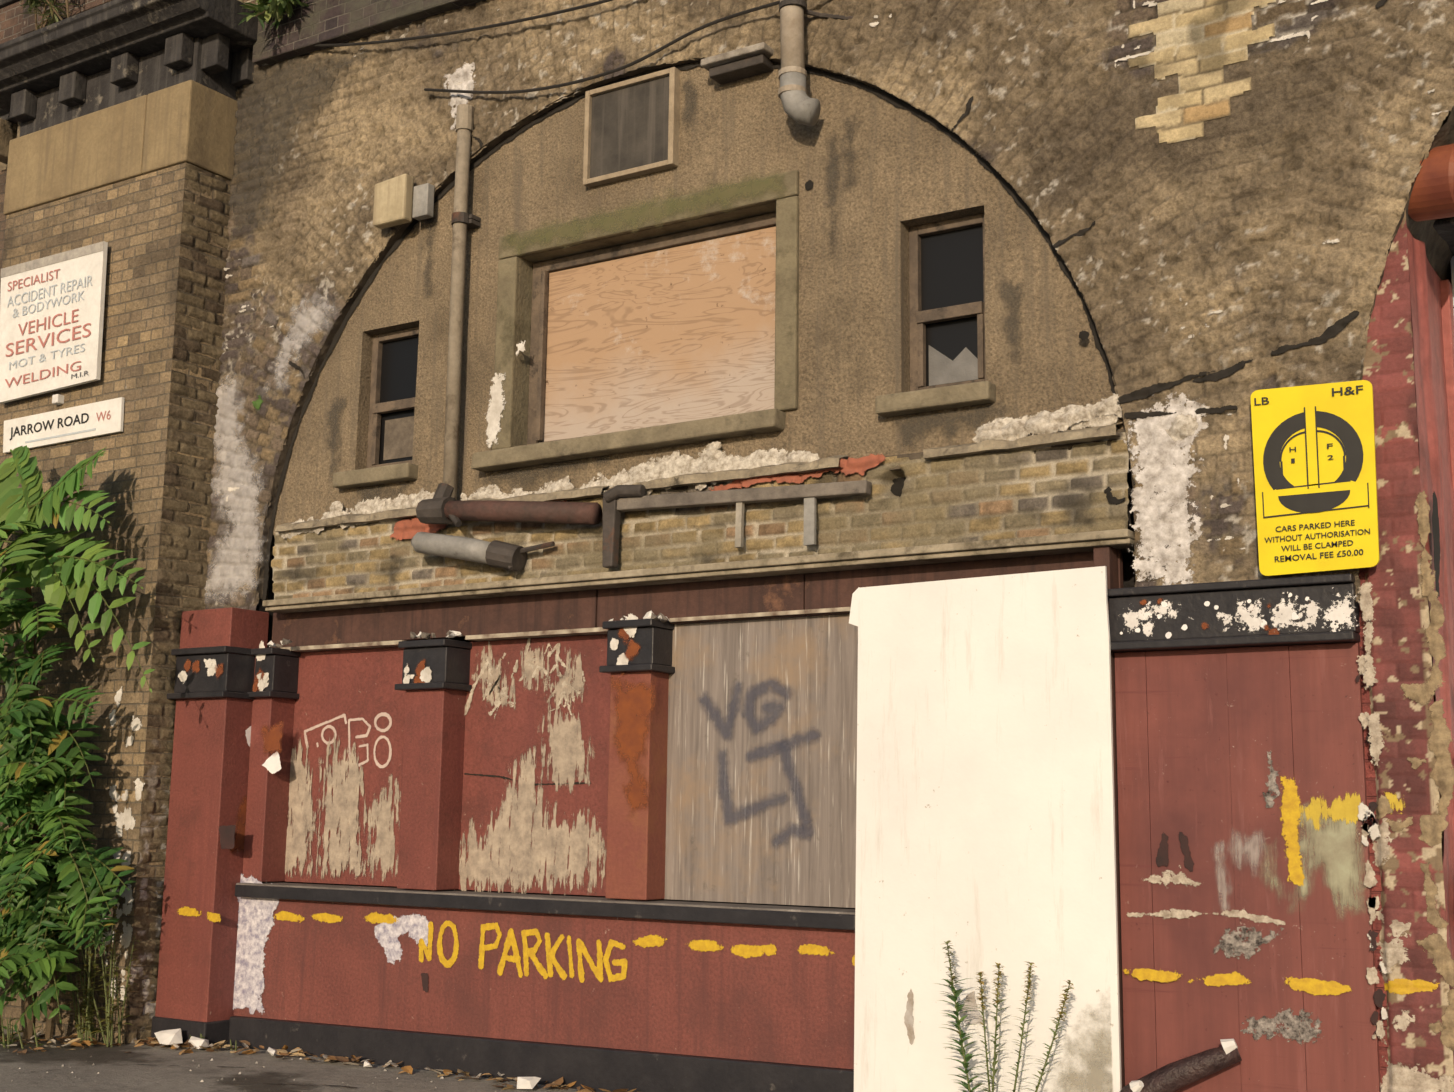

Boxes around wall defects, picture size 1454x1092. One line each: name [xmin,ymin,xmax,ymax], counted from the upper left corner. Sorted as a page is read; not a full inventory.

leakage [266,302,332,386]
leakage [1002,284,1021,344]
leakage [207,377,261,596]
leakage [327,400,344,472]
leakage [358,482,409,502]
spalling [460,441,886,502]
peeling [923,392,1379,690]
peeling [609,611,669,674]
peeling [285,733,401,882]
peeling [454,641,606,896]
corrosion [612,681,655,809]
spalling [1358,491,1454,1092]